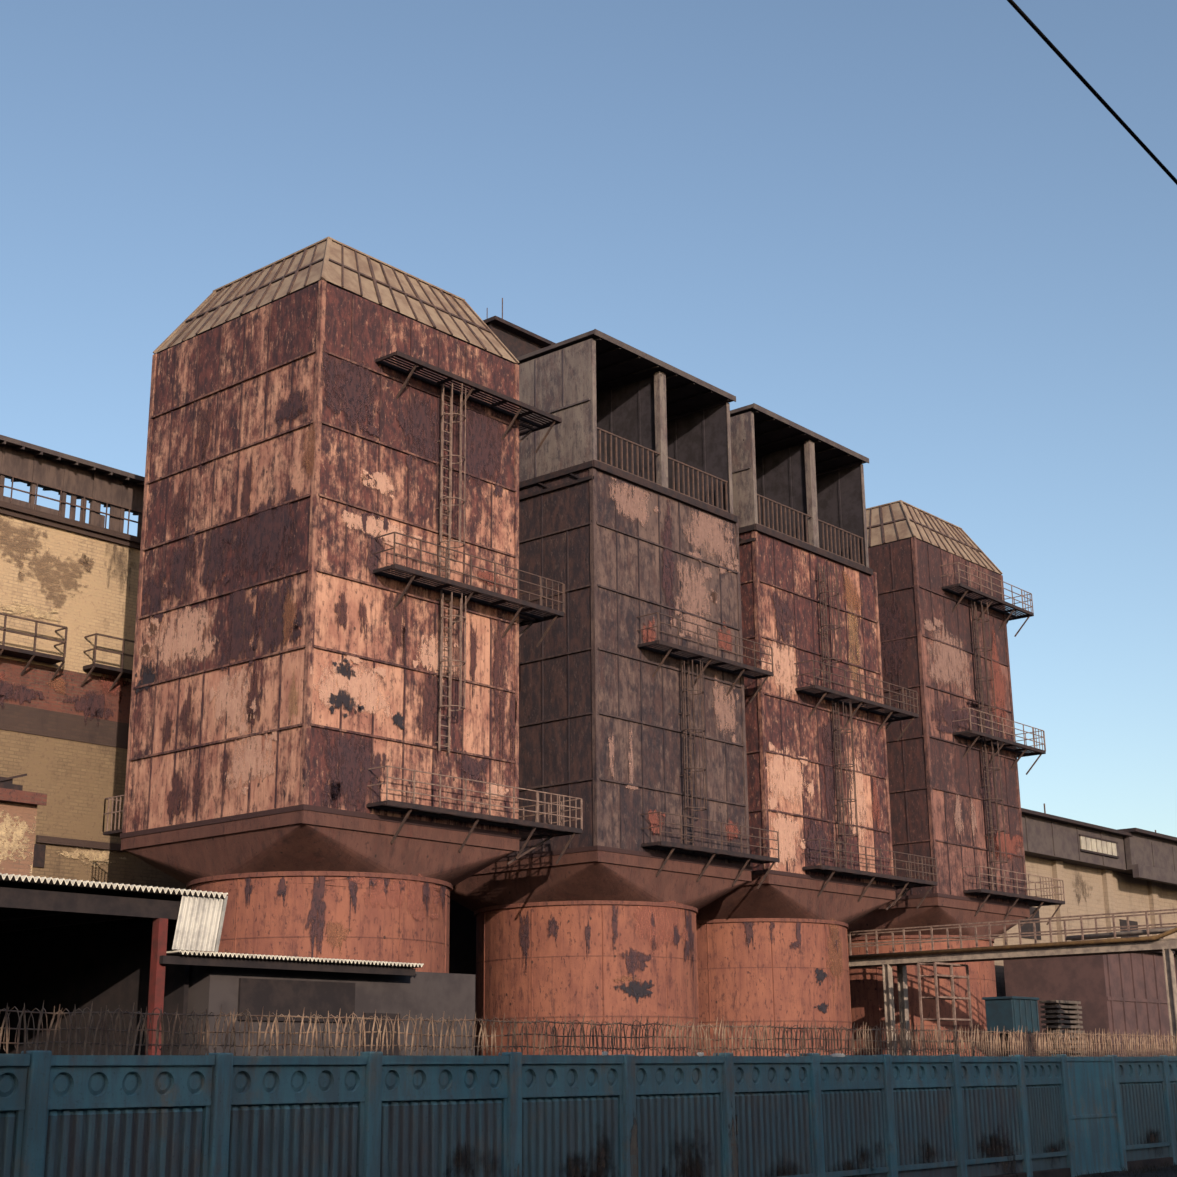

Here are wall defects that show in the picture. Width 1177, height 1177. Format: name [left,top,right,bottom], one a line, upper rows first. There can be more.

corrosion [240,454,253,575]
corrosion [334,592,367,642]
corrosion [384,588,407,664]
corrosion [773,591,793,656]
corrosion [160,683,194,756]
corrosion [246,671,261,732]
corrosion [418,671,446,762]
corrosion [456,571,517,794]
corrosion [167,768,203,824]
corrosion [220,749,230,796]
spalling [0,812,36,876]
corrosion [303,876,405,958]